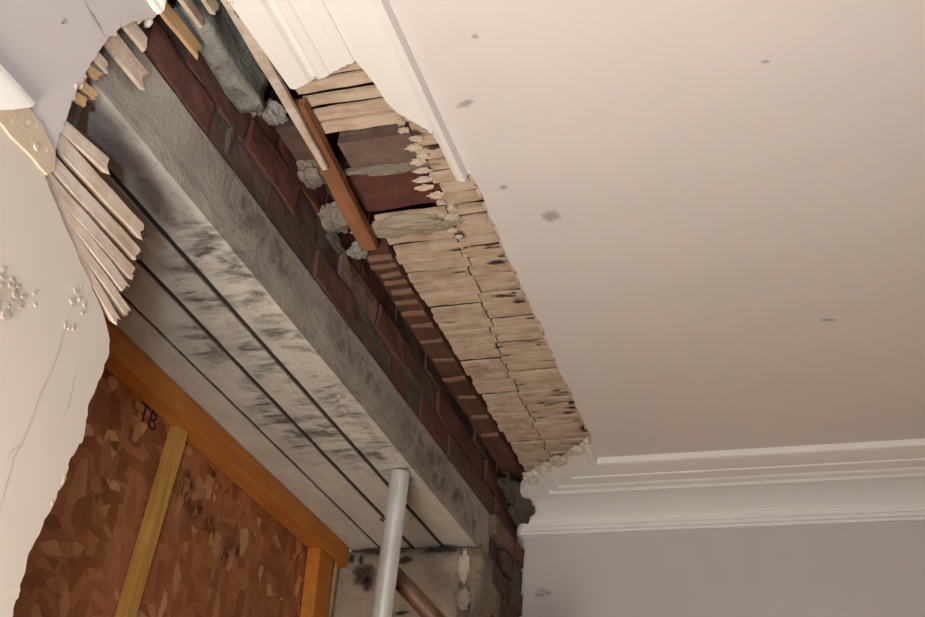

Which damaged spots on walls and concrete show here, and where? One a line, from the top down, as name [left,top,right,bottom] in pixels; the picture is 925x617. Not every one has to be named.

flaking render [0,108,56,175]
peeling [0,266,37,319]
spalling [388,104,591,485]